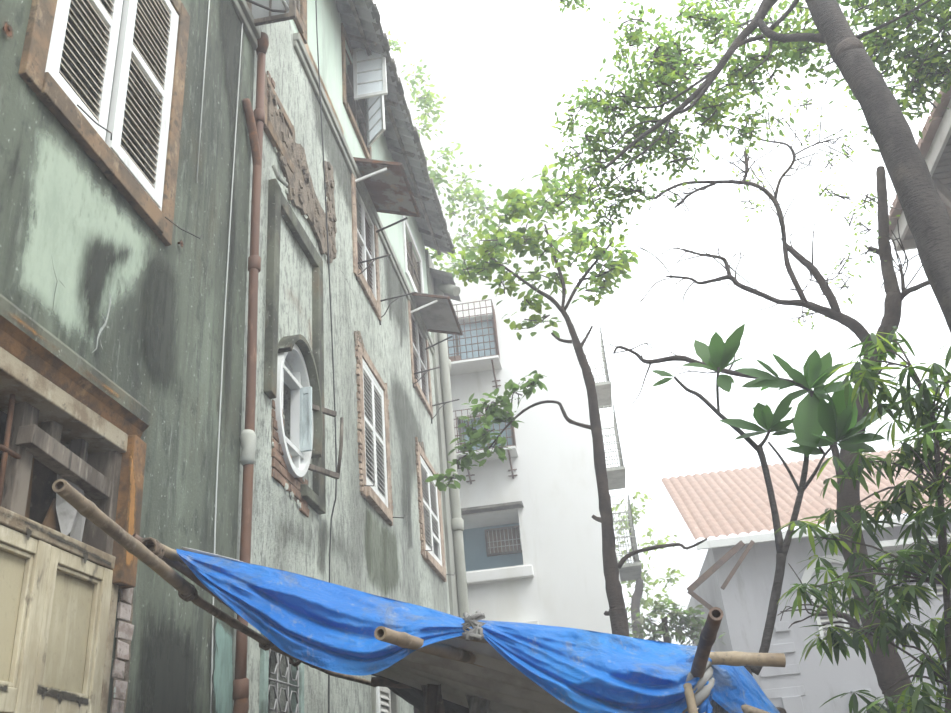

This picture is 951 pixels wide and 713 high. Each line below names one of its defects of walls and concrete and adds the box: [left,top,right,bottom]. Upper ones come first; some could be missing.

leakage [81,238,130,334]
leakage [144,257,176,386]
leakage [136,616,196,713]